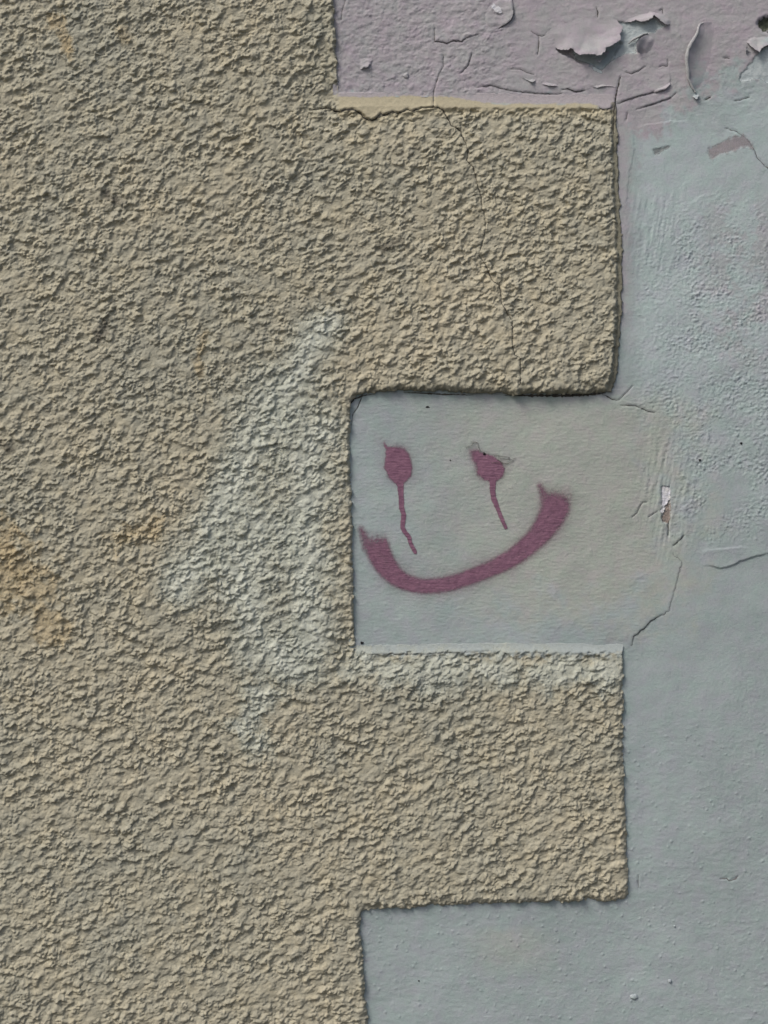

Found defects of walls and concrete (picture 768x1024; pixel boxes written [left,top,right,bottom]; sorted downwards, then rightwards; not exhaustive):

peeling [542,11,671,88]
peeling [685,22,715,99]
peeling [739,17,768,83]
crack [317,11,676,413]
flaking render [660,486,671,523]